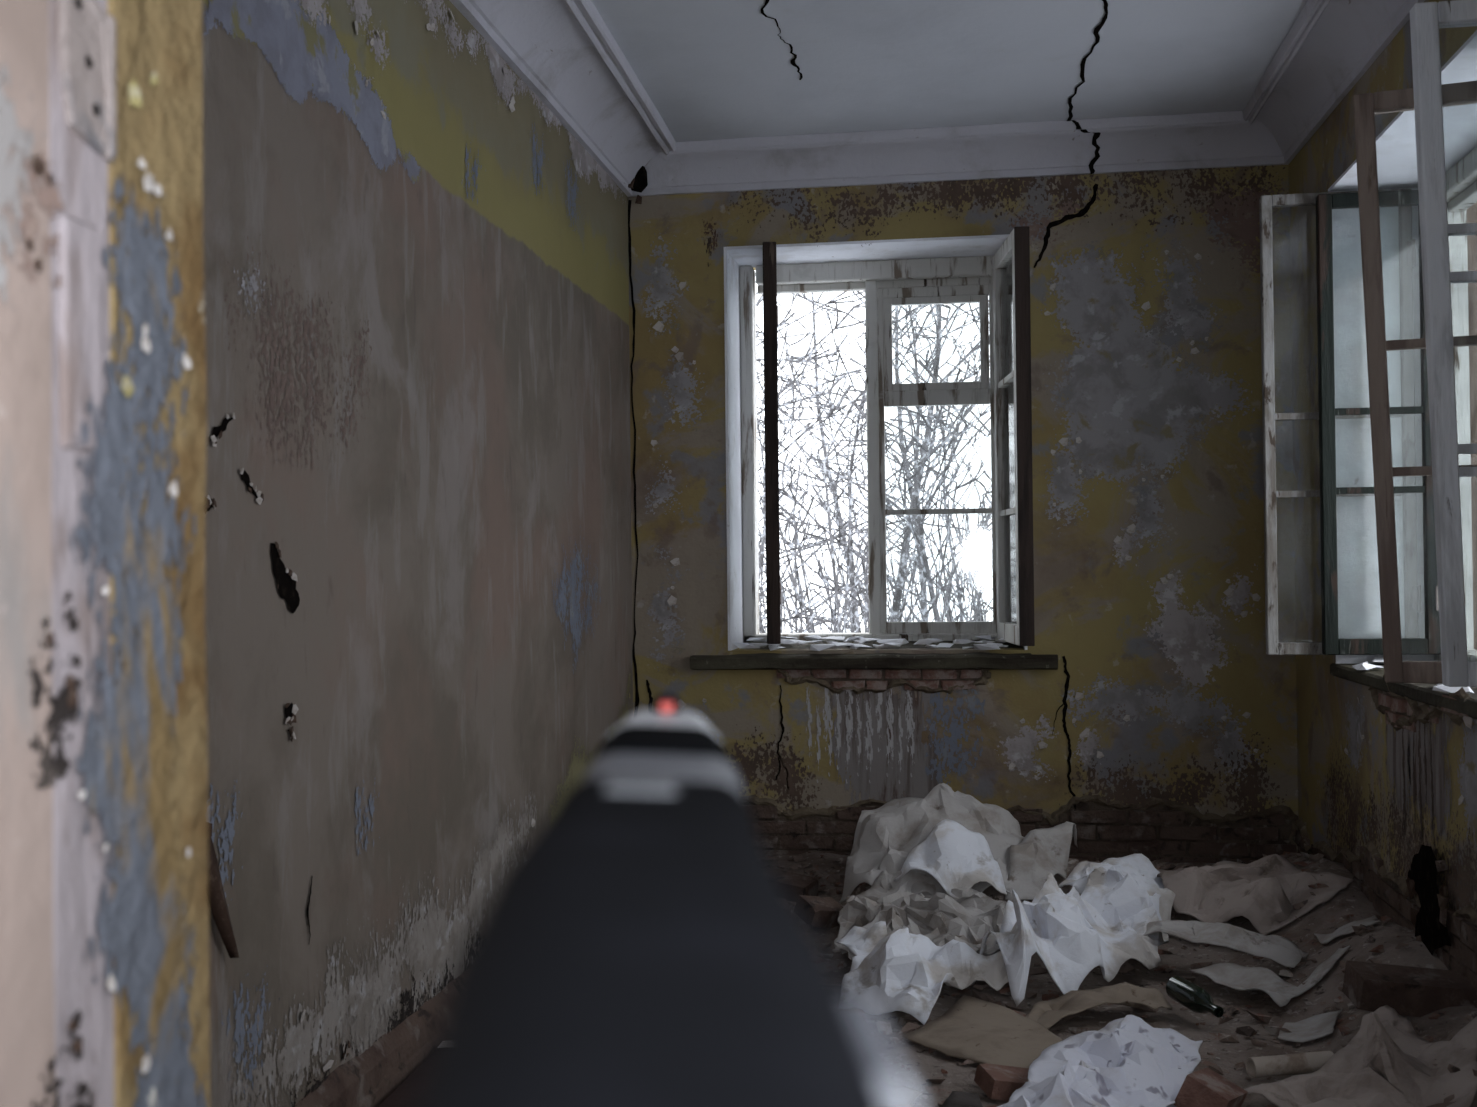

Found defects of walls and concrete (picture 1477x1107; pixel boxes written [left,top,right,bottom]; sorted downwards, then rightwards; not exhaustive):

peeling [202,0,422,184]
crack [761,0,803,80]
crack [1034,0,1108,268]
spalling [271,541,300,613]
peeling [996,529,1264,789]
spalling [284,703,299,742]
leakage [730,686,947,812]
crack [1052,656,1076,810]
flaking render [745,794,887,857]
flaking render [1007,794,1299,863]
peeling [229,783,538,1107]
spalling [1403,845,1451,956]